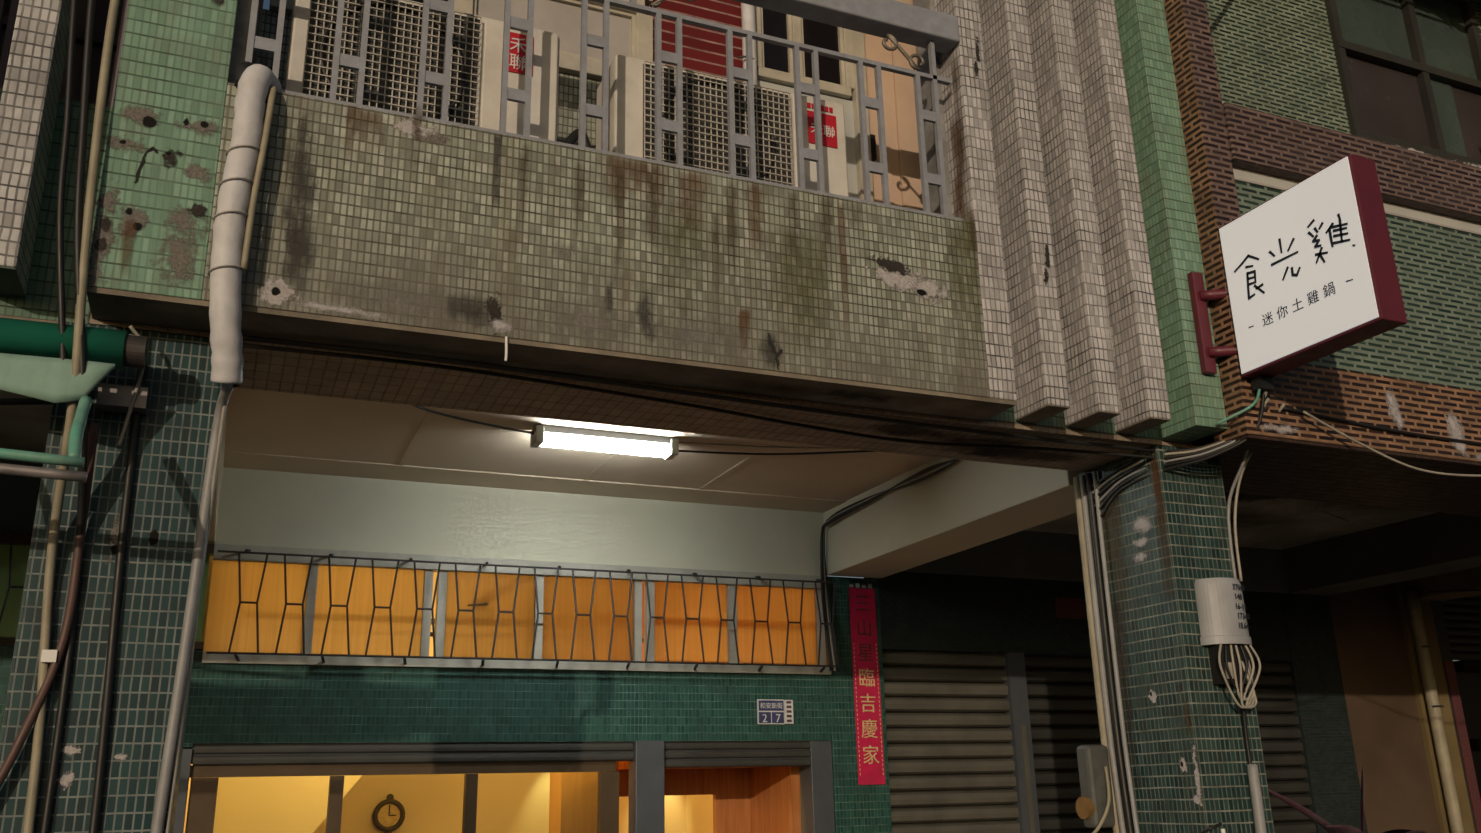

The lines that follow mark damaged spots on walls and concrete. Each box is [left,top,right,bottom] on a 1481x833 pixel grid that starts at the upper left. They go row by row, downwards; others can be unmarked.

spalling [104,105,156,153]
spalling [174,118,217,134]
spalling [162,150,209,181]
spalling [88,190,149,286]
spalling [158,203,208,285]
spalling [865,255,949,305]
leakage [639,297,651,335]